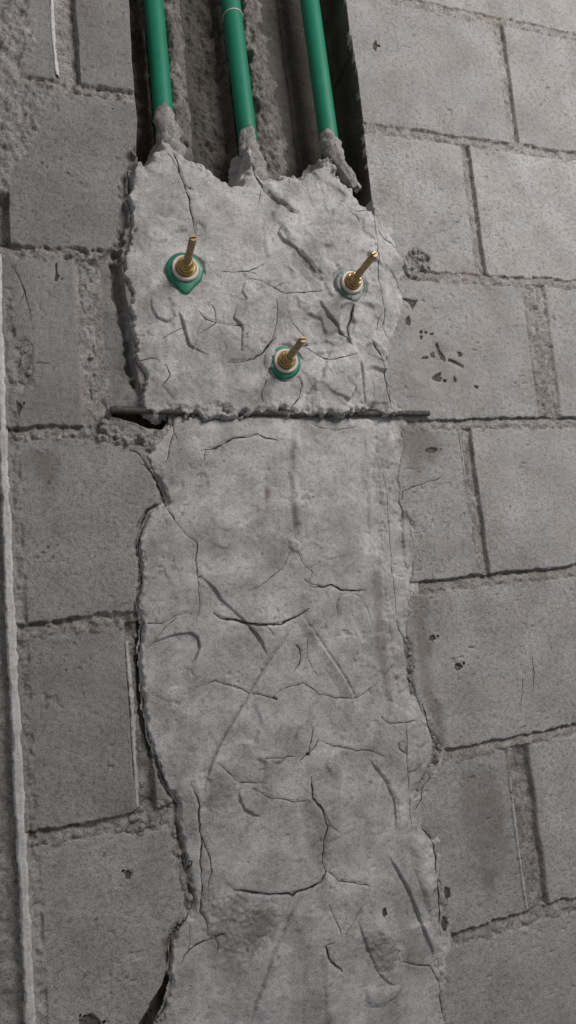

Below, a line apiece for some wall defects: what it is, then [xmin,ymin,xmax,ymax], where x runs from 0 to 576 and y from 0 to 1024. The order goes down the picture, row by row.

crack [168,151,196,235]
crack [252,164,297,214]
crack [221,200,398,407]
peeling [401,296,464,383]
crack [129,304,373,971]
crack [383,472,444,641]
crack [218,666,442,972]
crack [397,950,450,1023]